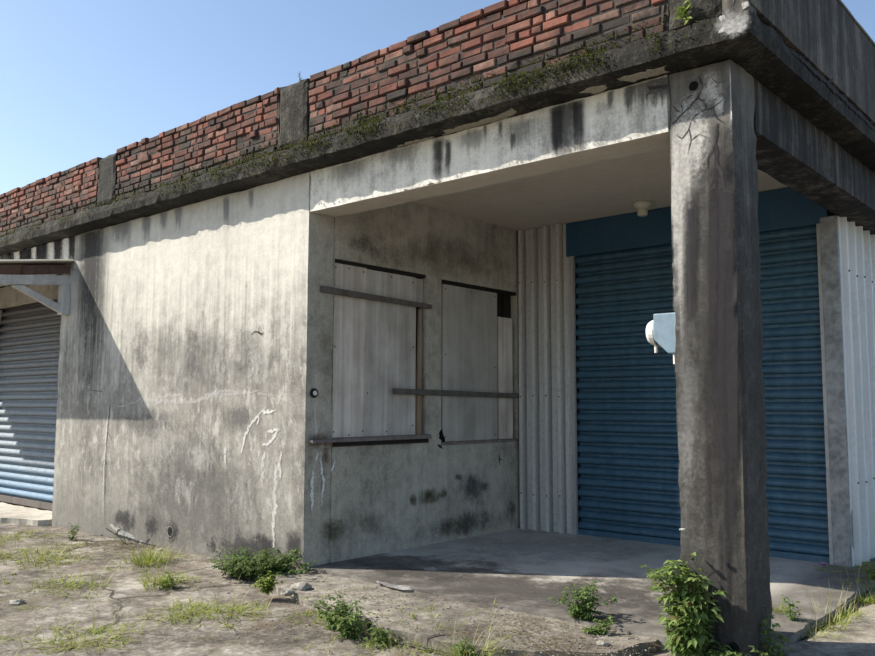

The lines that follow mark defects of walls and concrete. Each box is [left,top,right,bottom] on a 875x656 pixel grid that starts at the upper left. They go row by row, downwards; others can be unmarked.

spalling [718,15,748,35]
spalling [616,66,669,83]
water stain [551,101,582,153]
crack [646,70,725,194]
water stain [433,140,450,176]
water stain [231,410,275,425]
water stain [315,452,335,506]
water stain [116,512,134,530]
water stain [209,451,282,559]
water stain [287,536,299,555]